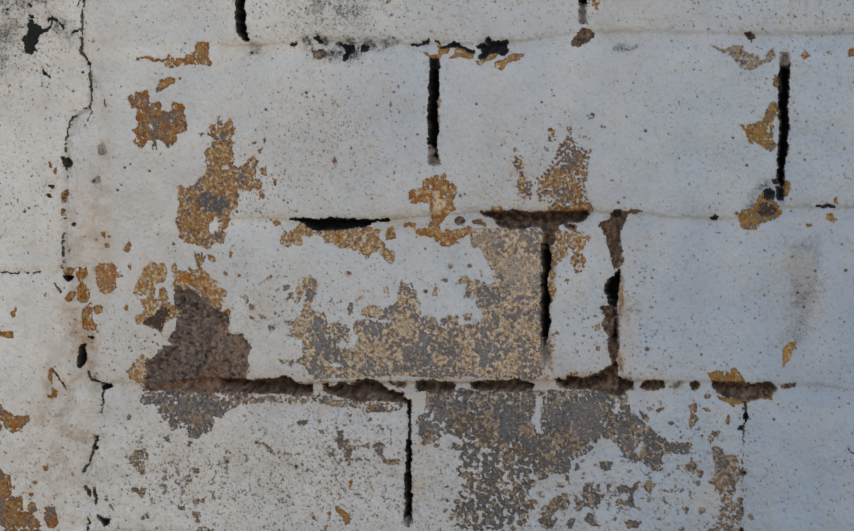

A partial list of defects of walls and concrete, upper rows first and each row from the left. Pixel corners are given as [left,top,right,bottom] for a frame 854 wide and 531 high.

crack [1,0,107,293]
peeling [127,42,213,150]
peeling [740,101,779,152]
peeling [63,263,131,332]
peeling [124,116,796,531]
peeling [0,404,30,433]
peeling [48,368,58,398]
crack [47,336,113,413]
peeling [0,469,59,531]
crack [82,435,110,531]